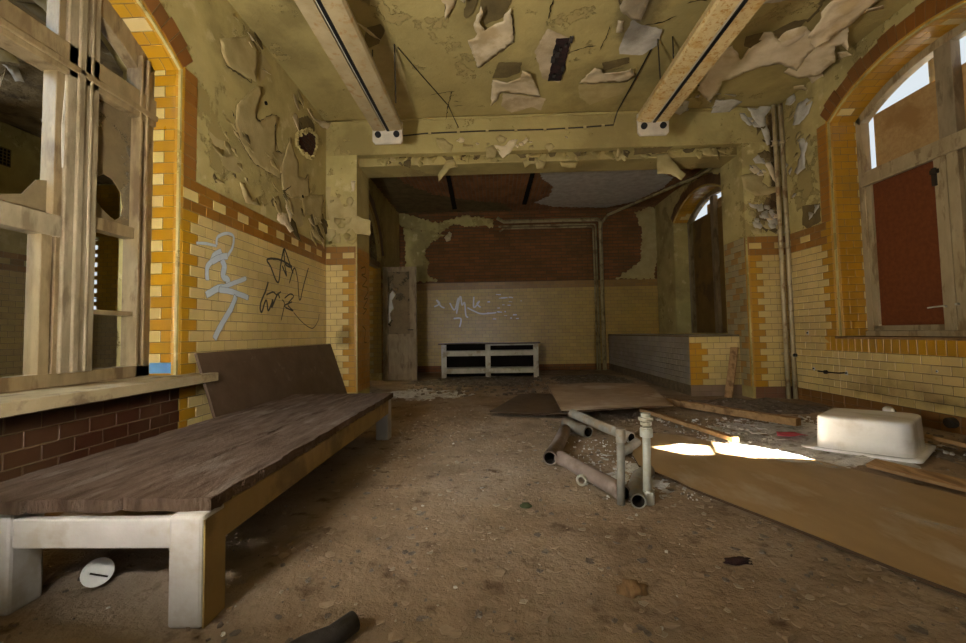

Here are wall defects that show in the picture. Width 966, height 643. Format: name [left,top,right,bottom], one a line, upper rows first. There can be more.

peeling [0,47,24,87]
peeling [16,0,47,23]
peeling [357,22,414,117]
peeling [441,0,568,113]
peeling [578,0,662,105]
peeling [675,0,884,234]
flaking render [369,135,728,283]